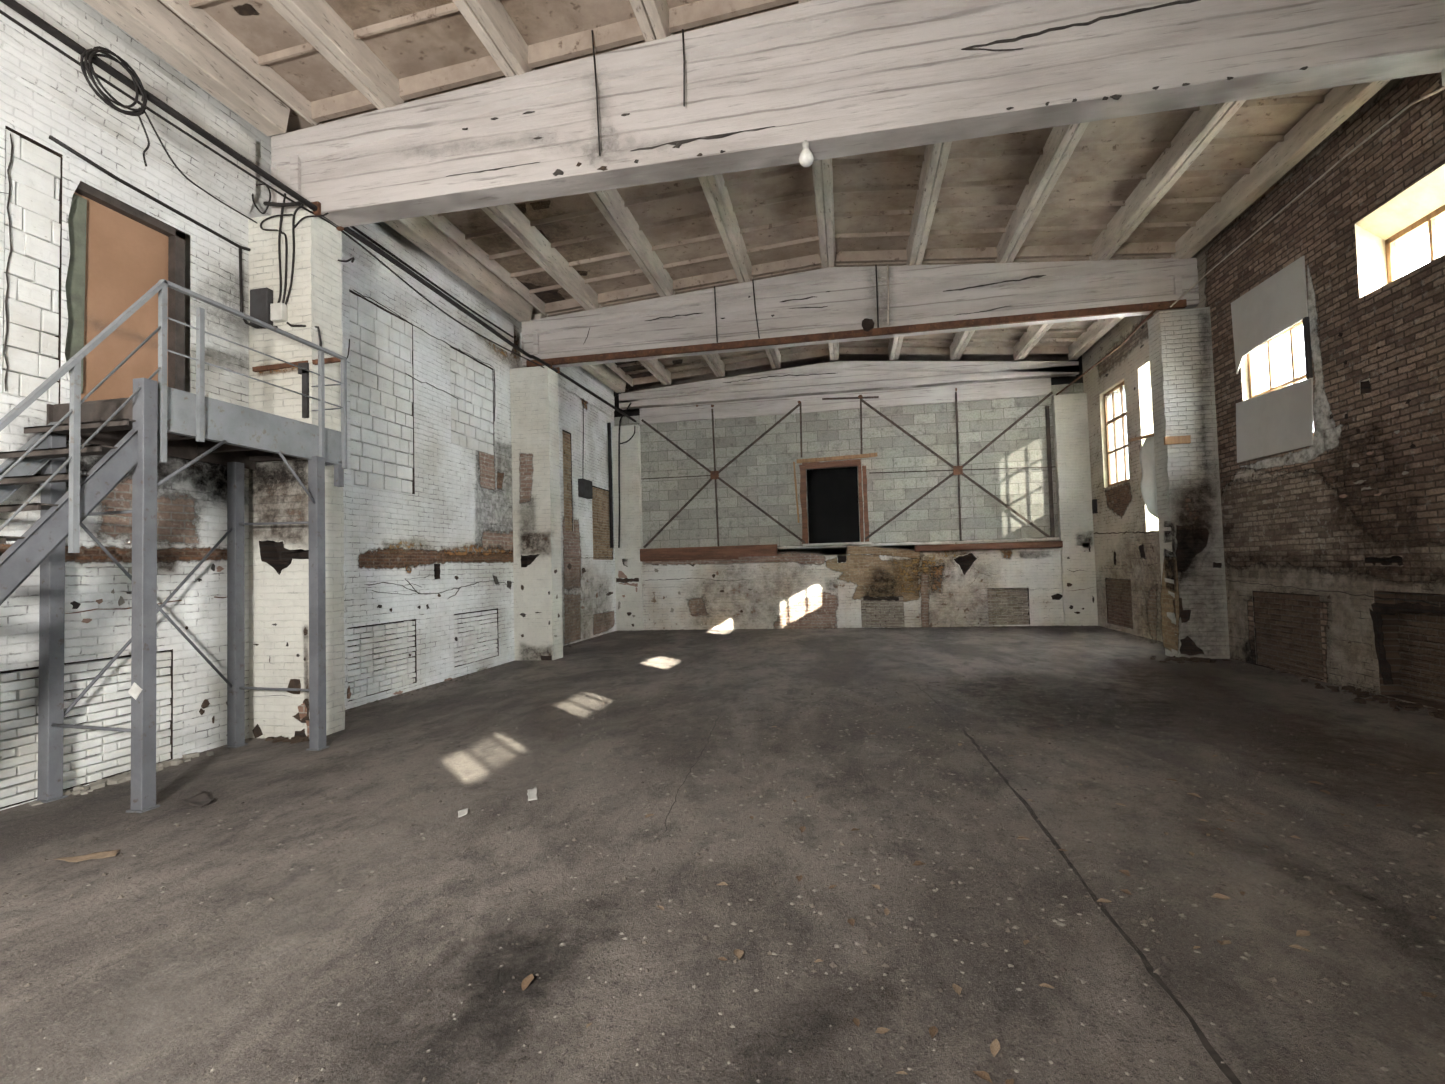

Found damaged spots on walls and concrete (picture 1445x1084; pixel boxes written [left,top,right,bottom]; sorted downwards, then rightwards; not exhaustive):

crack [961,0,1201,51]
peeling [1204,72,1445,584]
spalling [259,540,309,575]
peeling [476,443,639,644]
flaking render [774,545,935,629]
crack [916,684,1242,1084]